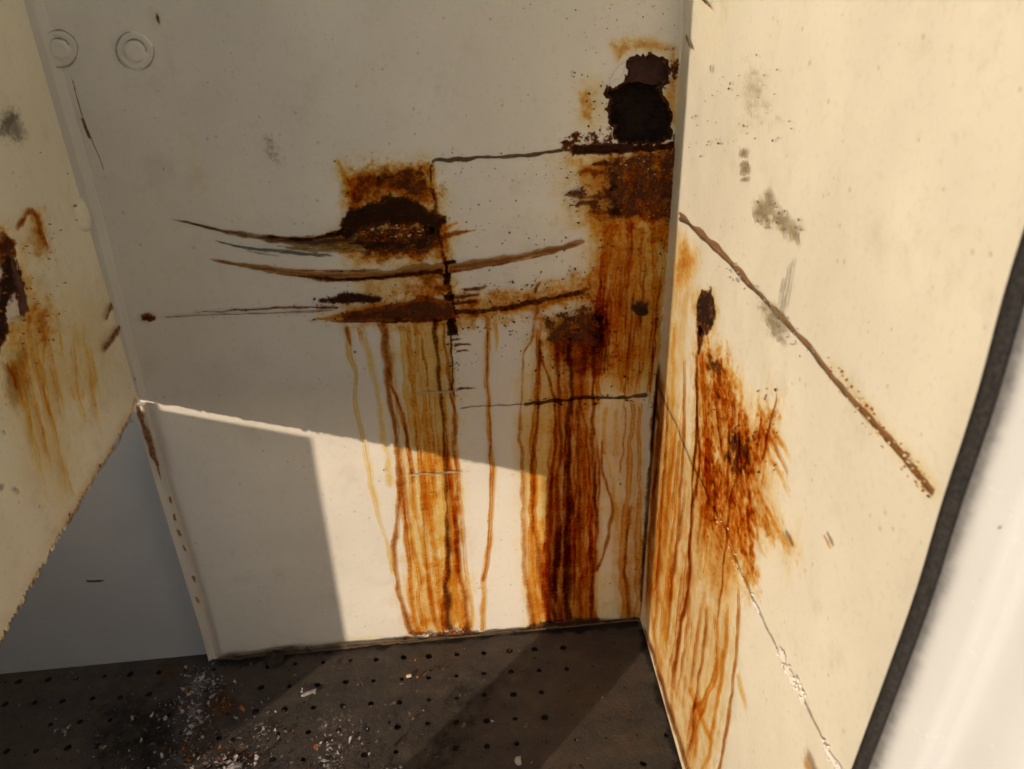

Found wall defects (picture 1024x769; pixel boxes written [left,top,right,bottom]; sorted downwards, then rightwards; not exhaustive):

spalling [607,72,671,144]
rust [0,208,62,403]
rust [287,48,791,769]
rust [860,404,931,498]